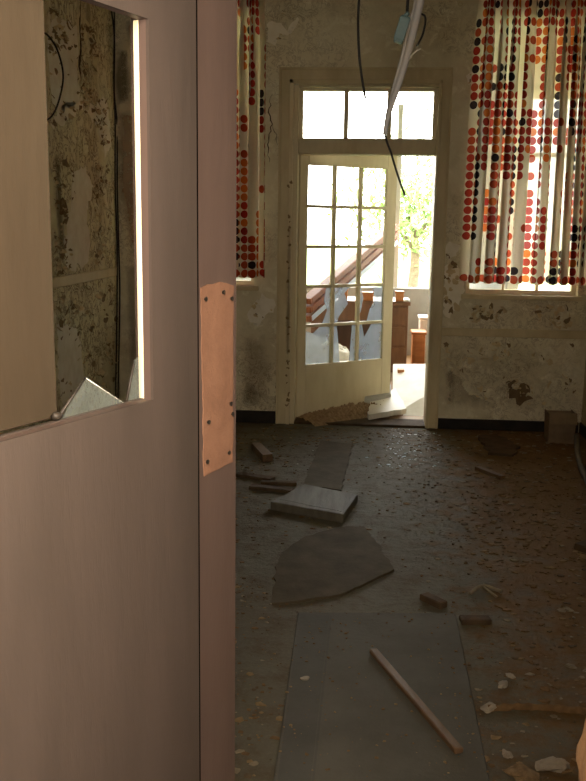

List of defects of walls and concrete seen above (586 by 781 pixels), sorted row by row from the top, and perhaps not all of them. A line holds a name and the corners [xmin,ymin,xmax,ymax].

peeling [47,7,114,276]
peeling [443,261,507,324]
peeling [506,380,533,406]